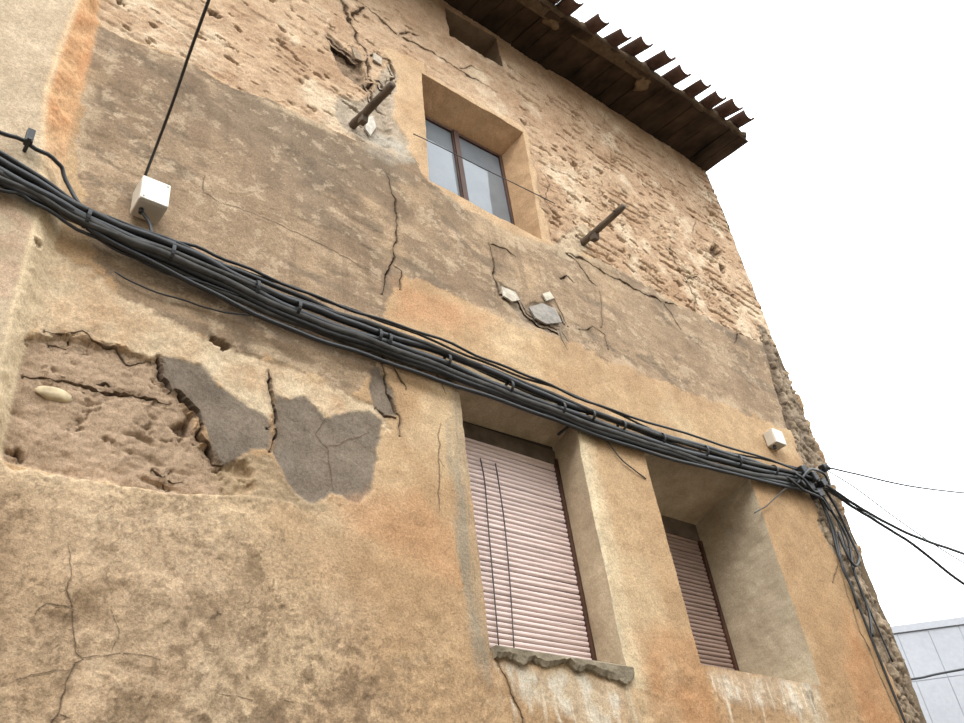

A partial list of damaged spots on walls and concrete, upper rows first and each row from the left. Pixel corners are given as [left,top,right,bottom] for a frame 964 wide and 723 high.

peeling [88,0,413,146]
crack [202,173,405,296]
peeling [0,329,255,496]
crack [263,371,282,452]
crack [314,355,409,491]
peeling [470,18,921,723]
damp [442,388,639,723]
crack [493,658,527,723]